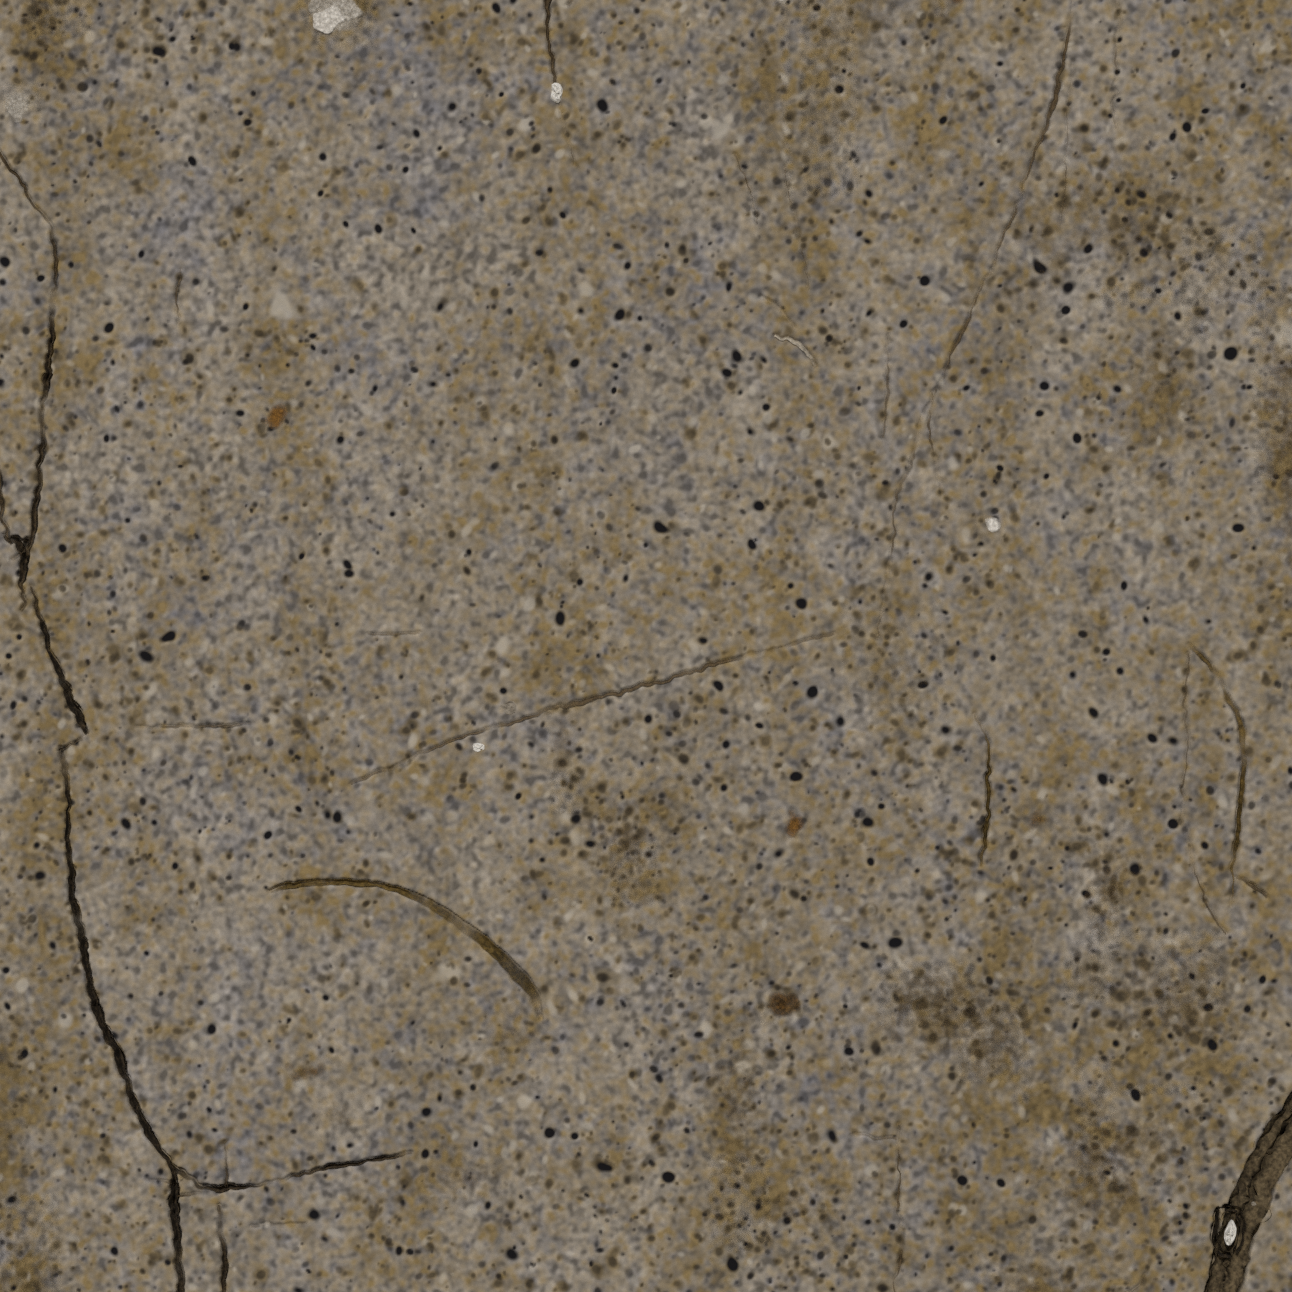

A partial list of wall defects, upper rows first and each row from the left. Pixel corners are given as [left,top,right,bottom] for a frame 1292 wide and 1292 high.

crack [544,0,562,104]
crack [1024,28,1070,180]
crack [998,210,1017,248]
crack [947,287,982,364]
crack [926,418,934,445]
crack [890,508,898,549]
crack [0,152,404,1292]
crack [426,659,734,752]
crack [1206,1093,1292,1292]